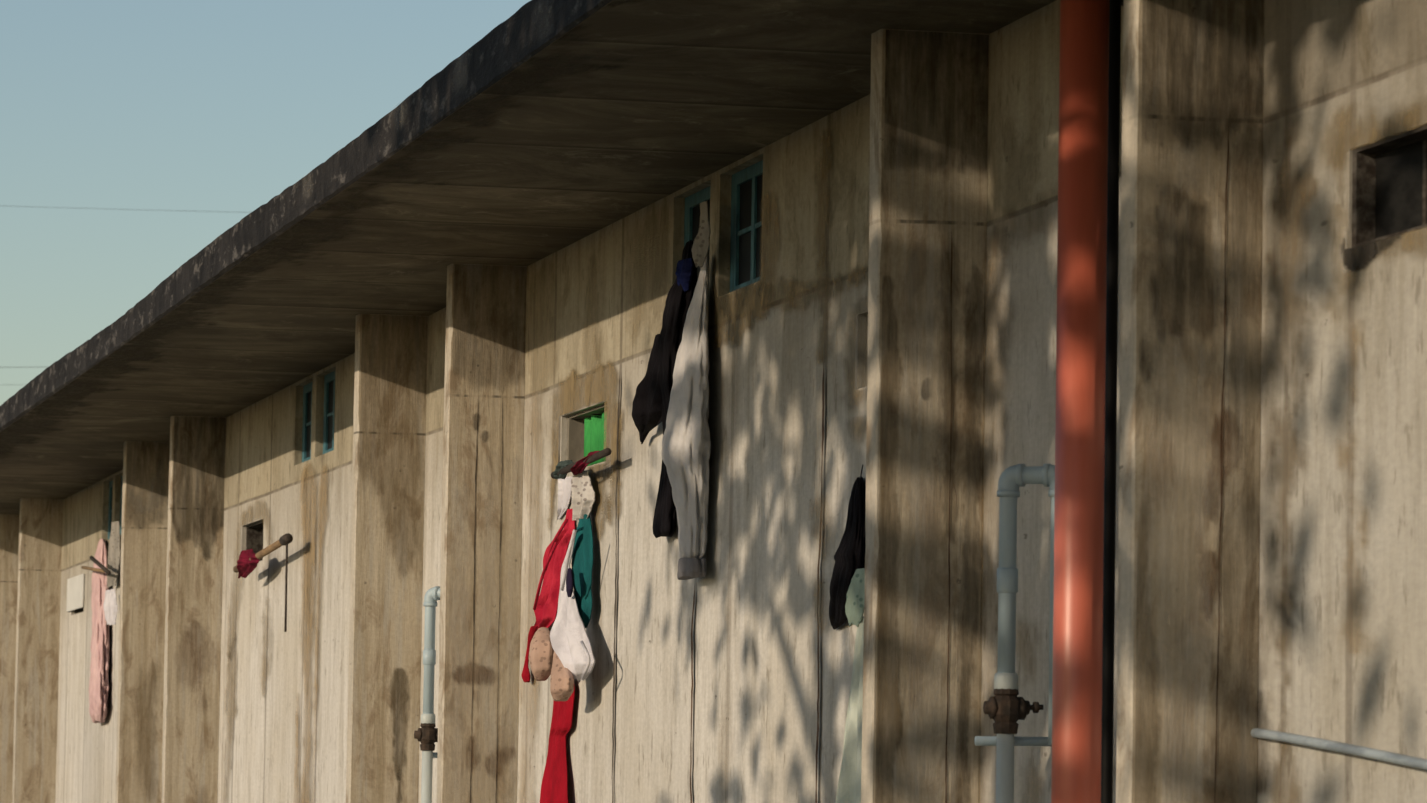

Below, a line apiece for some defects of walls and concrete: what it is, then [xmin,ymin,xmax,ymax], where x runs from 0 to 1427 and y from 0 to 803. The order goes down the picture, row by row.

leakage [1149,0,1264,145]
leakage [0,26,618,454]
leakage [393,669,406,800]